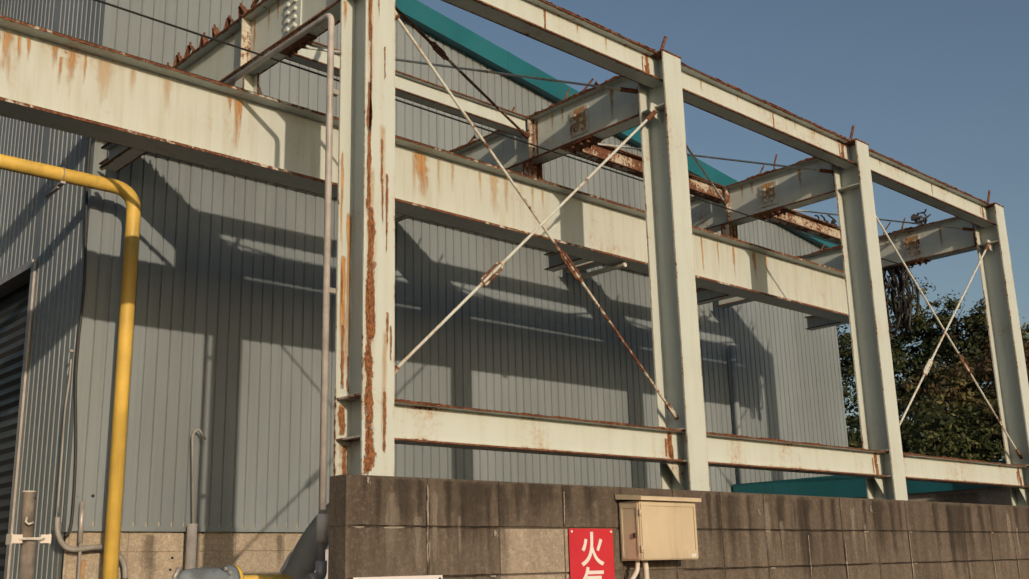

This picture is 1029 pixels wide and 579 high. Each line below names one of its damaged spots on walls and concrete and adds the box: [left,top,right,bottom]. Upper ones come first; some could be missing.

rust [3,32,31,53]
rust [53,46,87,74]
rust [228,97,242,133]
rust [363,0,679,474]
rust [340,153,351,392]
rust [338,405,347,475]
leakage [446,481,569,524]
leakage [798,498,811,558]